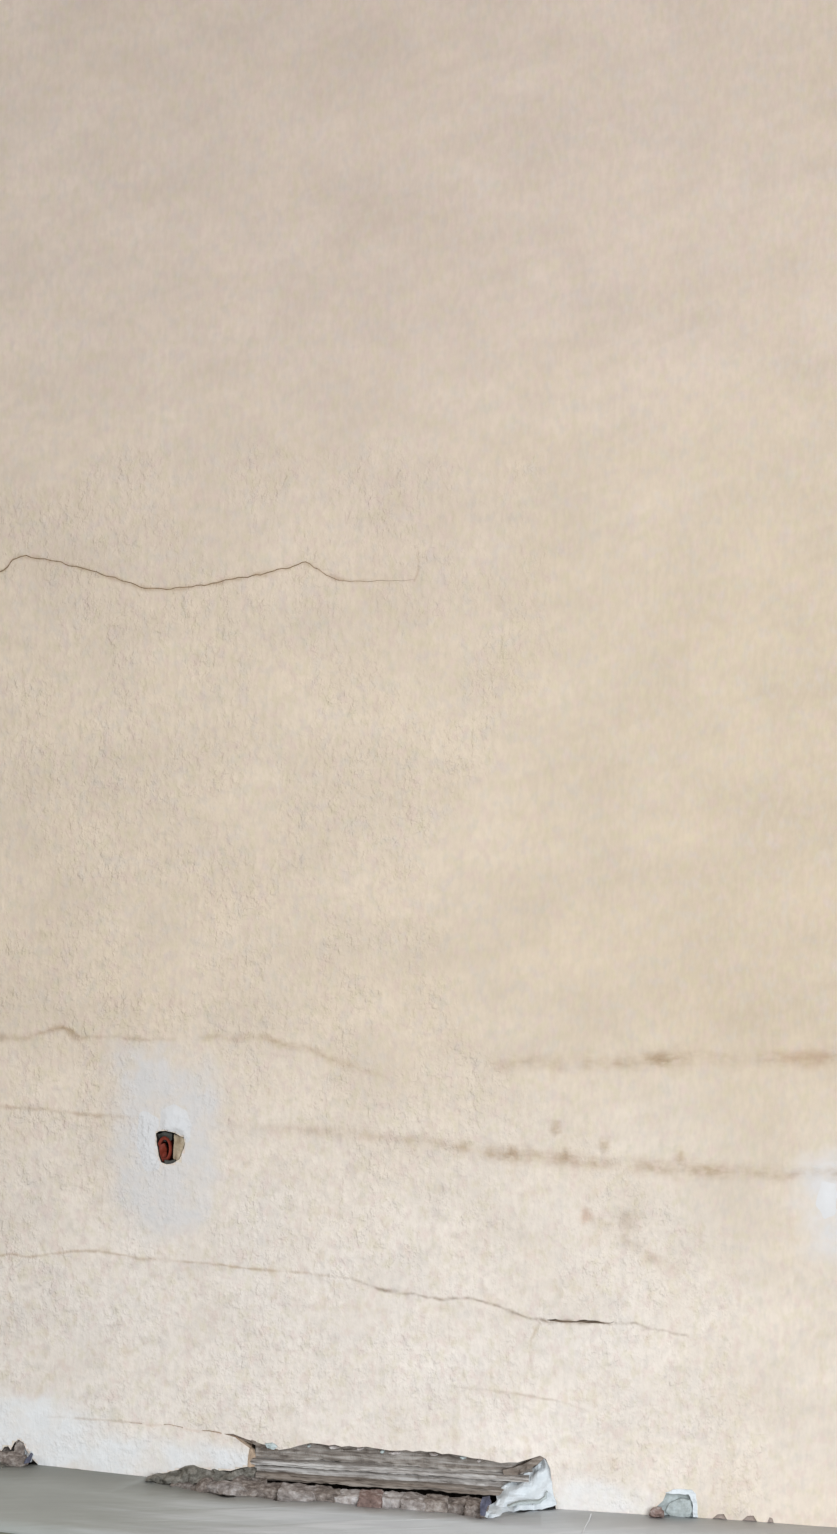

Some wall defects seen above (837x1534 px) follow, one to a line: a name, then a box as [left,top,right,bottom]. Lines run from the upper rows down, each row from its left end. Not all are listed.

crack [0,555,407,590]
crack [544,1317,612,1325]
flaking render [145,1434,557,1519]